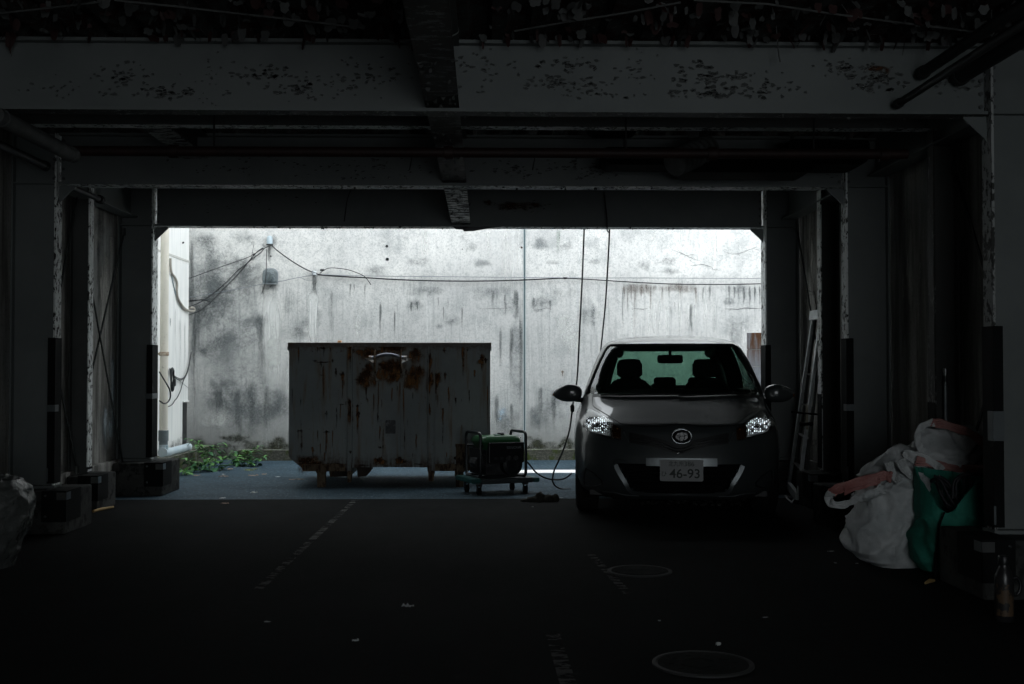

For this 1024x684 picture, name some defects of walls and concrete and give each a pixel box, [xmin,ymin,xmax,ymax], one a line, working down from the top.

peeling [455,0,655,100]
peeling [668,59,807,101]
water stain [212,296,289,425]
water stain [308,279,318,342]